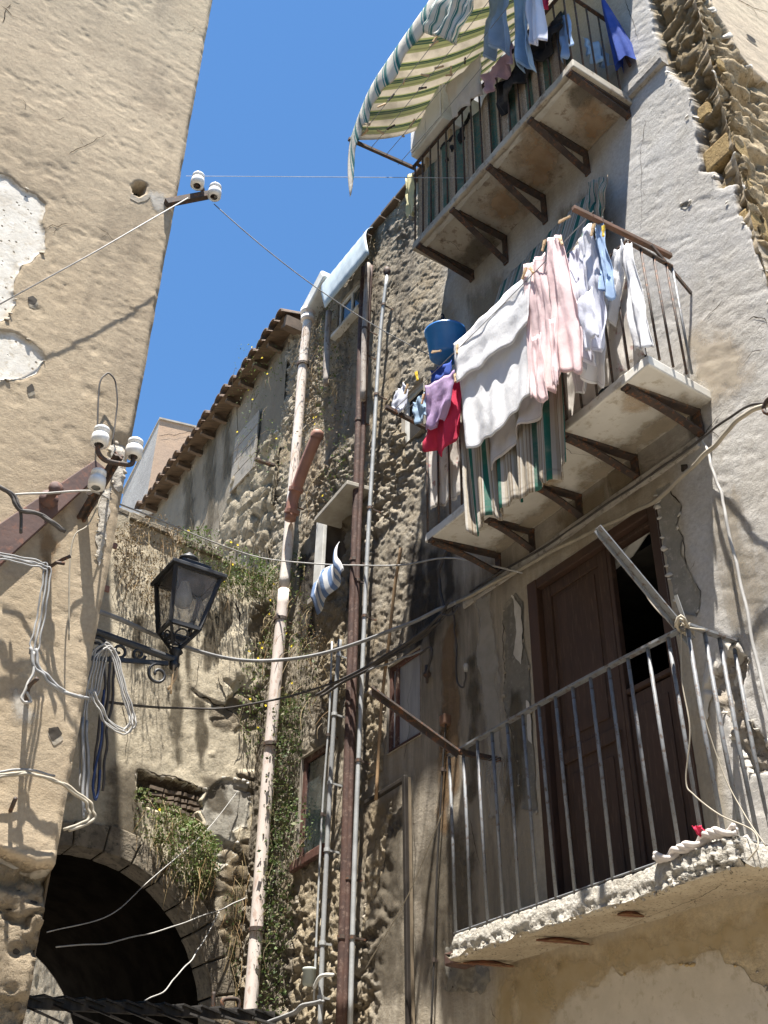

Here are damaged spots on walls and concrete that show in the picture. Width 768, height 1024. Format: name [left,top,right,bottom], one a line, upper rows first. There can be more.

flaking render [685,0,768,278]
flaking render [0,174,46,397]
spalling [443,905,595,995]
spalling [615,876,697,918]